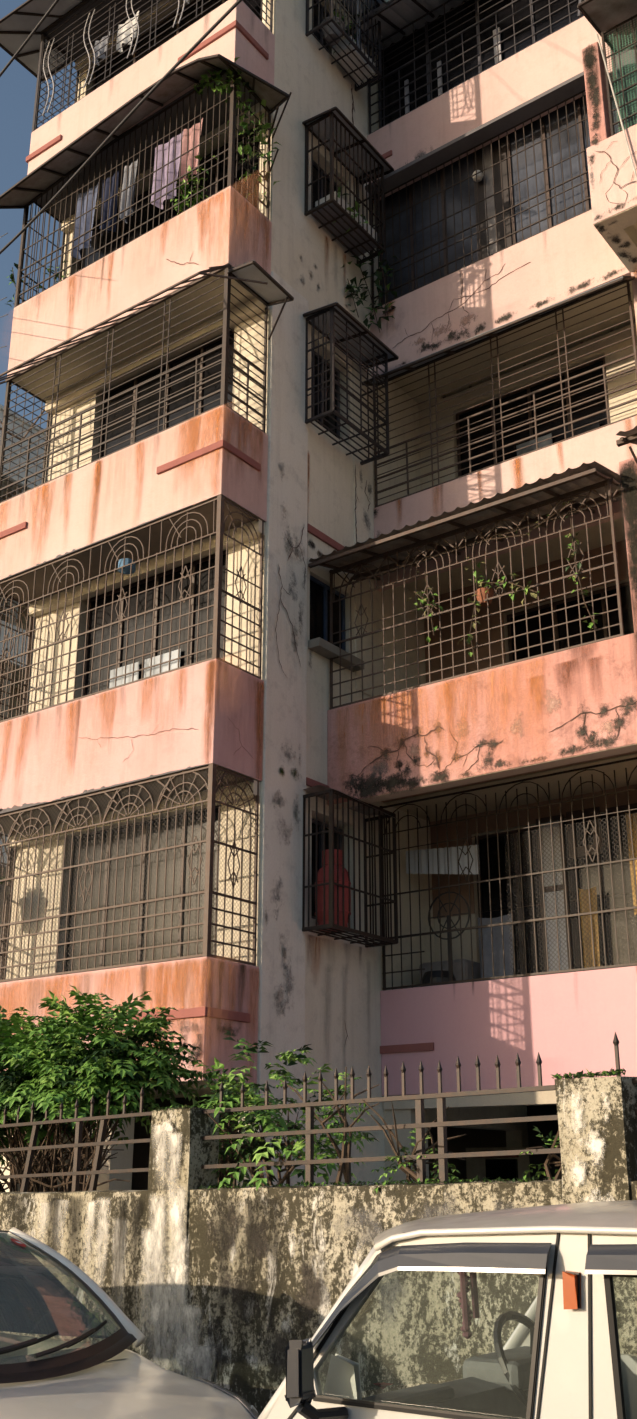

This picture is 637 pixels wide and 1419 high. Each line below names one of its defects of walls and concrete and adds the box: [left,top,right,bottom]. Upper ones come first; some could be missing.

crack [596,141,637,204]
crack [393,262,531,348]
damp [620,462,637,614]
crack [78,718,253,759]
damp [345,723,505,798]
damp [522,697,637,764]
corrosion [104,961,258,1022]
damp [49,1197,79,1252]
damp [114,1200,141,1296]
damp [197,1195,330,1390]